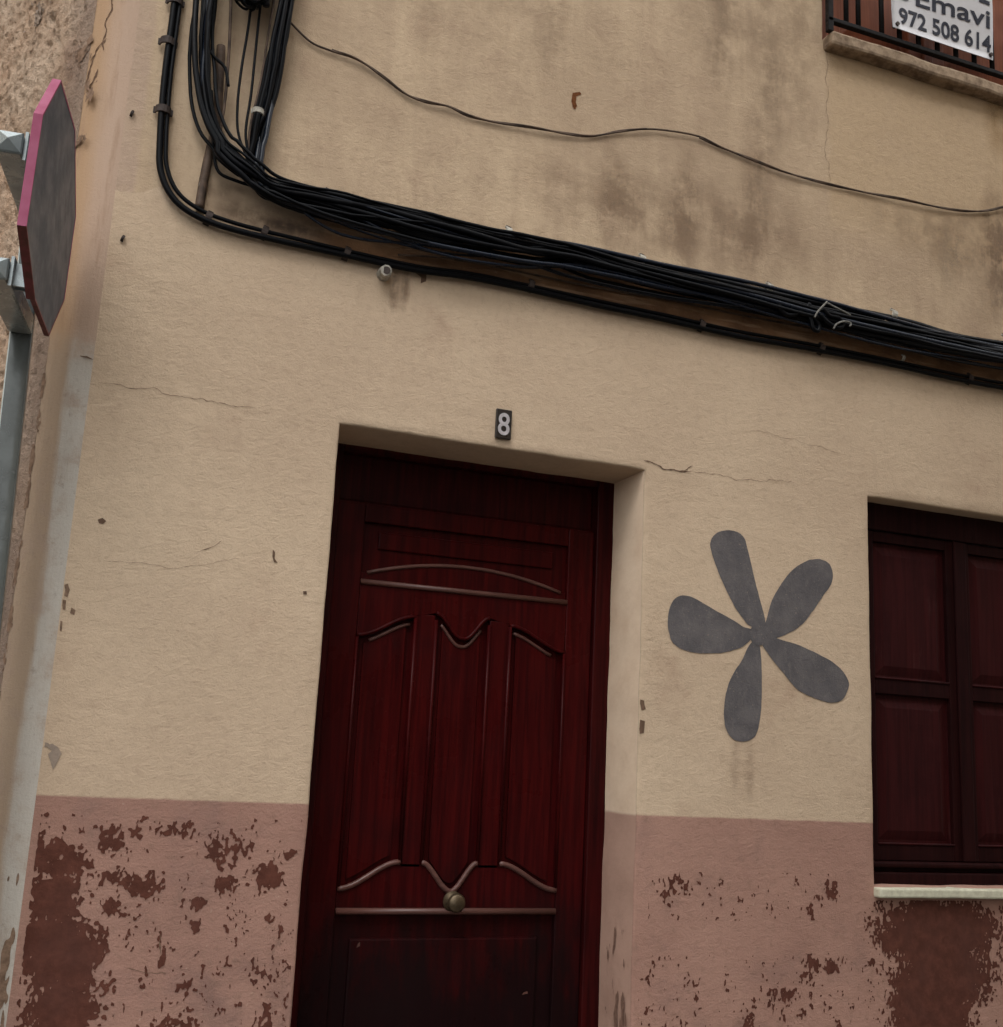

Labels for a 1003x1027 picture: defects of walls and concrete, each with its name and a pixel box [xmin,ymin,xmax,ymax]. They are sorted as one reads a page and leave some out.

crack [86,0,113,85]
crack [644,460,791,482]
peeling [0,812,297,1027]
peeling [652,872,840,920]
peeling [605,979,626,1027]
peeling [638,955,706,1027]
peeling [724,900,1003,1027]